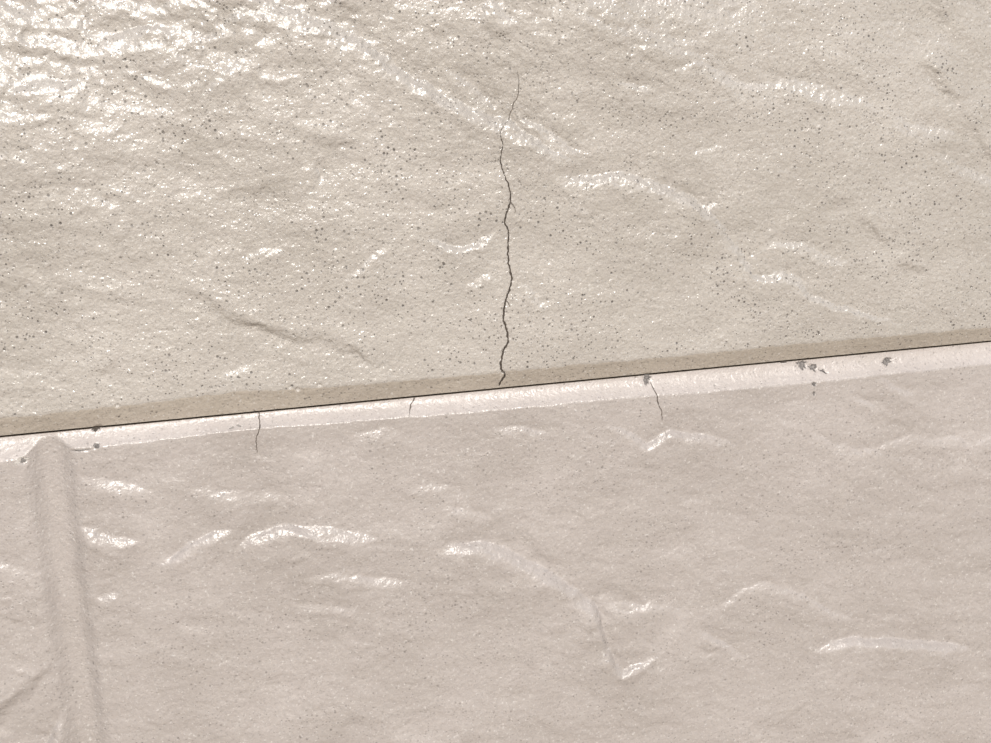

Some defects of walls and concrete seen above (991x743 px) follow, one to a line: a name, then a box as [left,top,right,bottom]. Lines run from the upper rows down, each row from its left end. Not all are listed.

crack [499,84,519,385]